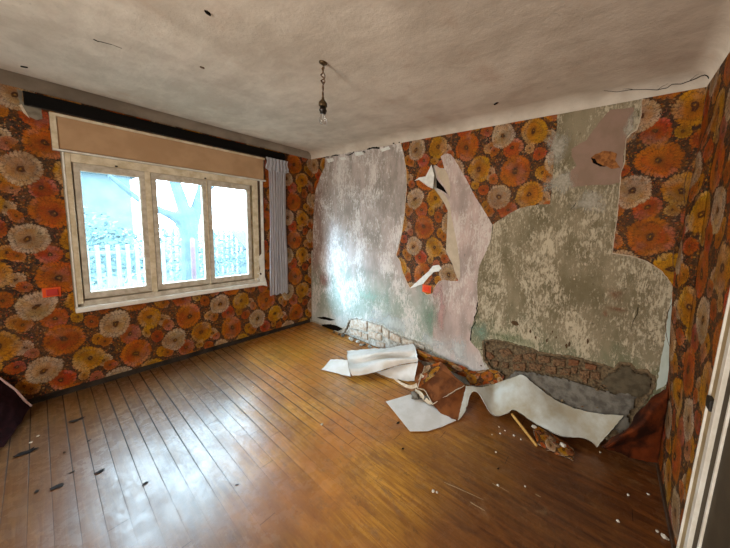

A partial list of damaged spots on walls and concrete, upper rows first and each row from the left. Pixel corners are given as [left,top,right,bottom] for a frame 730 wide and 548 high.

peeling [312,99,673,463]